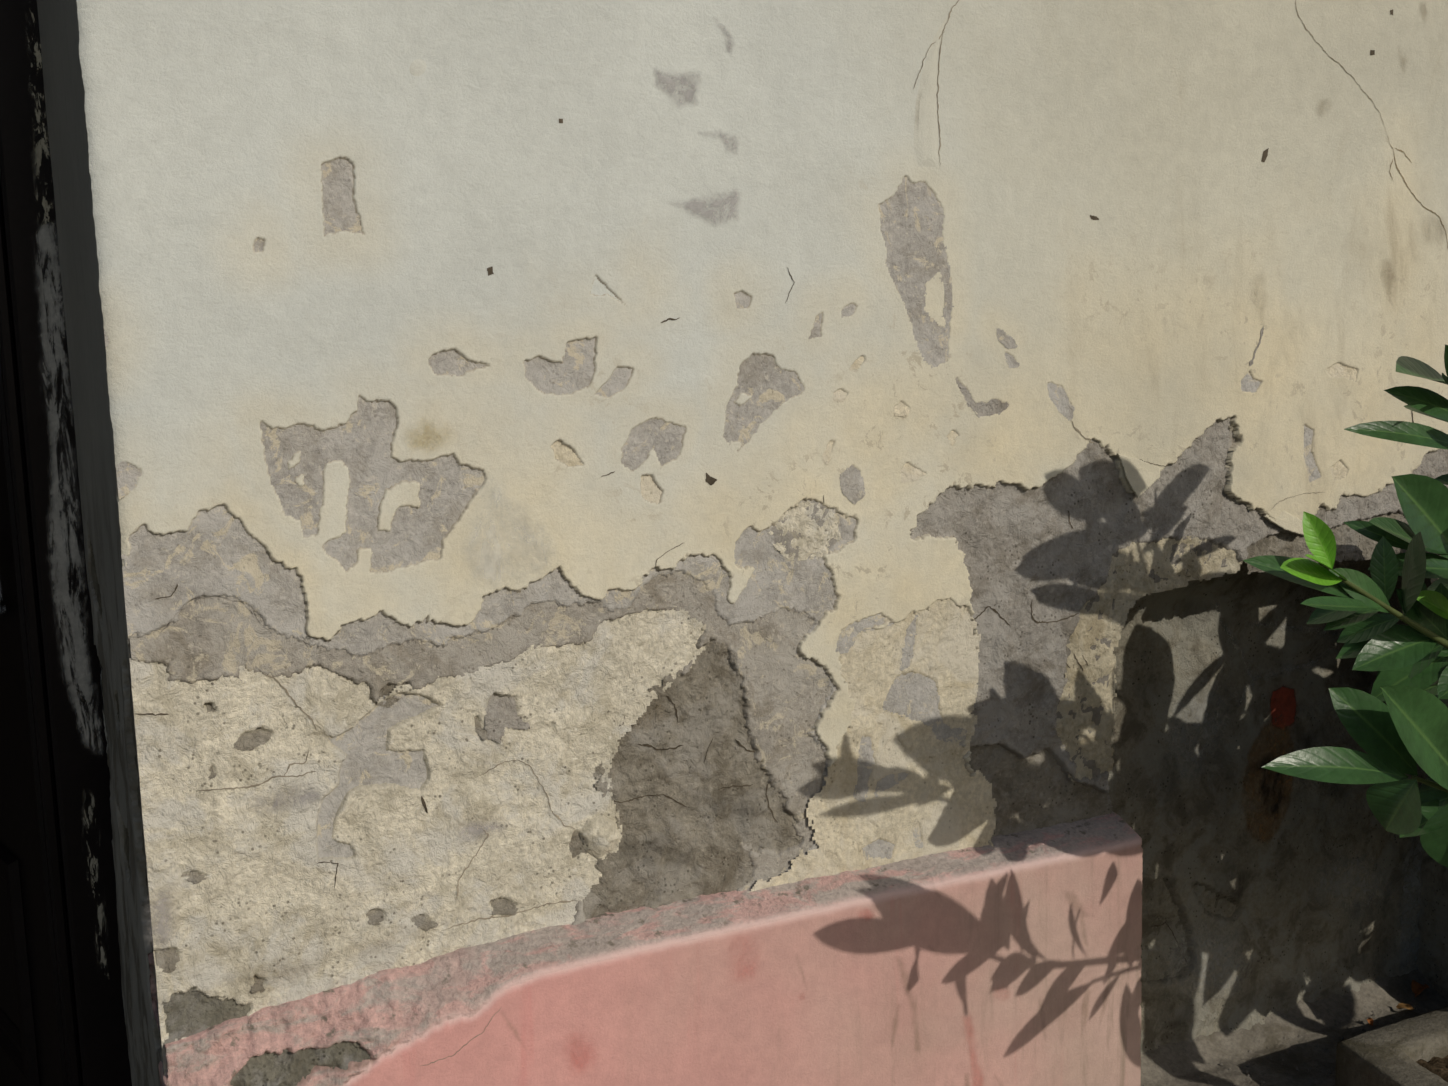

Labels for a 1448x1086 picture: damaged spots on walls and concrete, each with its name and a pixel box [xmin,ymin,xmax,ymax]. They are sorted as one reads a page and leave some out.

crack [1295,1,1448,244]
peeling [321,159,363,235]
flaking render [878,177,954,368]
flaking render [523,338,632,397]
flaking render [723,354,804,445]
flaking render [956,378,1009,418]
crack [1249,326,1264,366]
flaking render [1412,449,1448,488]
flaking render [99,397,1409,1075]
flaking render [230,1041,371,1086]